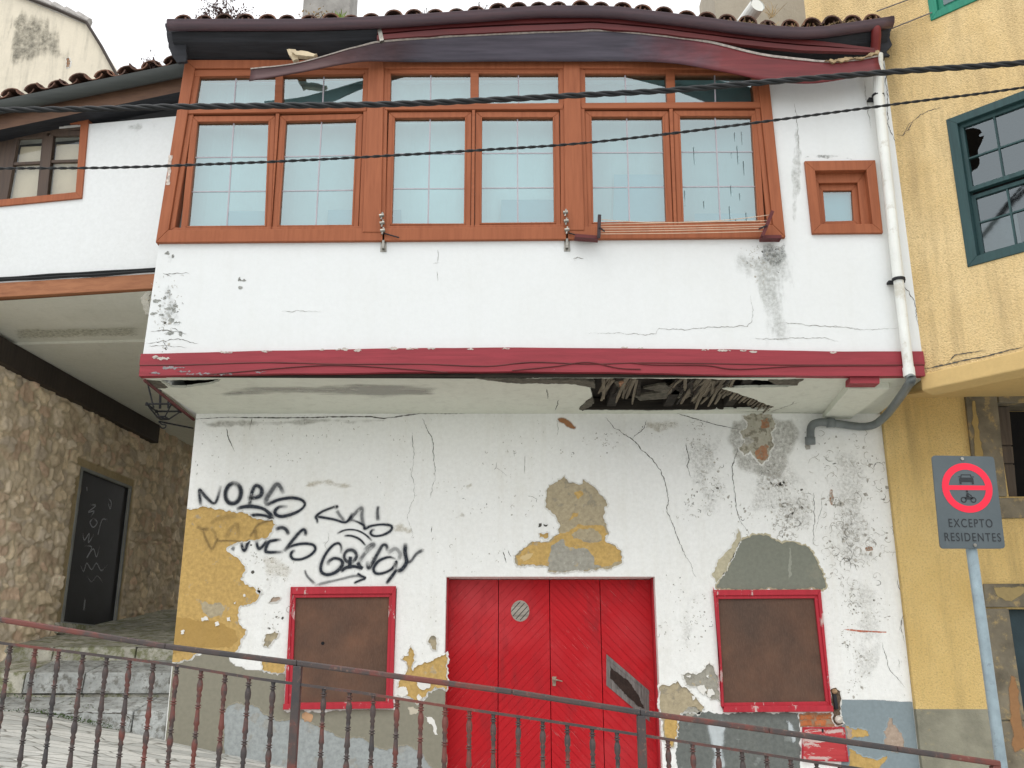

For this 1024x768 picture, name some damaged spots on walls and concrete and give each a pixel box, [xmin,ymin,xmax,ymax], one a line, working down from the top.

damp [150,292,182,336]
peeling [172,505,282,664]
crack [200,414,436,532]
peeling [513,475,624,575]
crack [611,422,694,574]
flaking render [710,528,742,584]
flaking render [737,413,777,466]
peeling [396,634,450,735]
peeling [657,661,720,751]